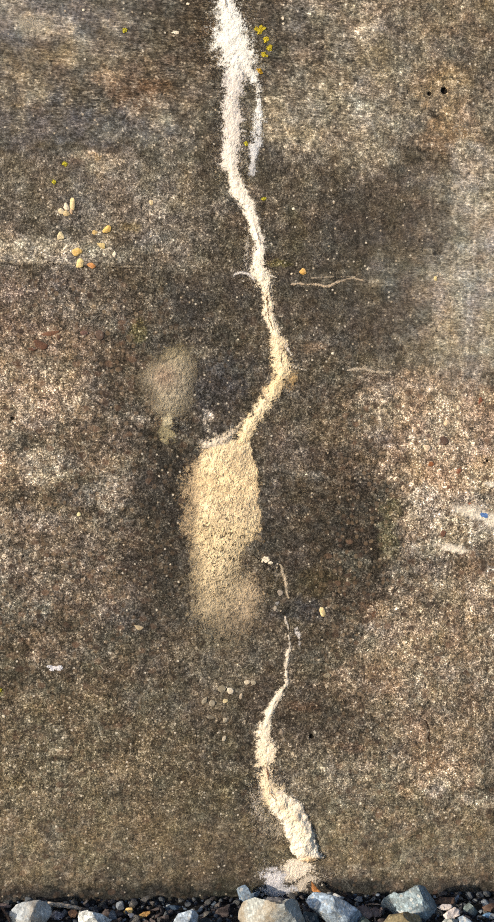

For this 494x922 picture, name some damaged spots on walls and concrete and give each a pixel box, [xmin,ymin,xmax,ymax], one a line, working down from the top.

leakage [175,0,306,659]
leakage [291,275,364,288]
leakage [249,616,328,898]